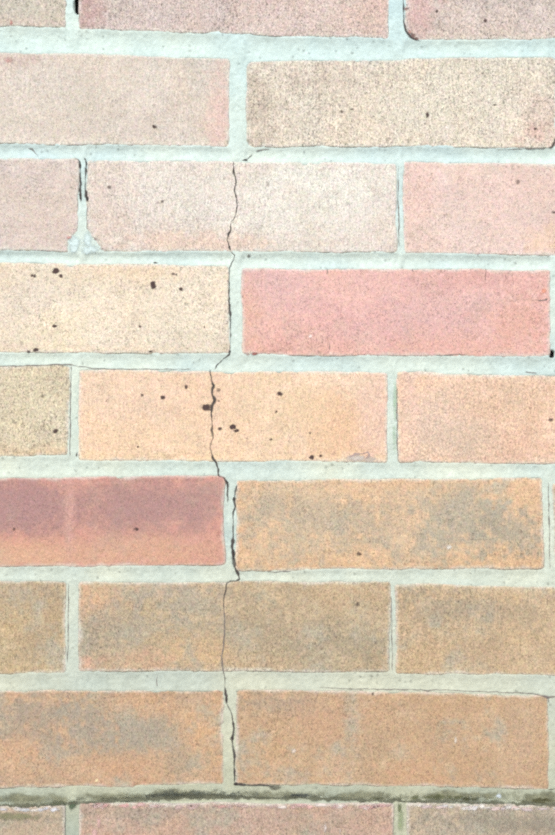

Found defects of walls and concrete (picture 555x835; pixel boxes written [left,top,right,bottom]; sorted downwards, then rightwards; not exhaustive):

crack [78,158,89,210]
crack [0,364,186,456]
crack [210,149,273,787]
leakage [0,786,555,812]